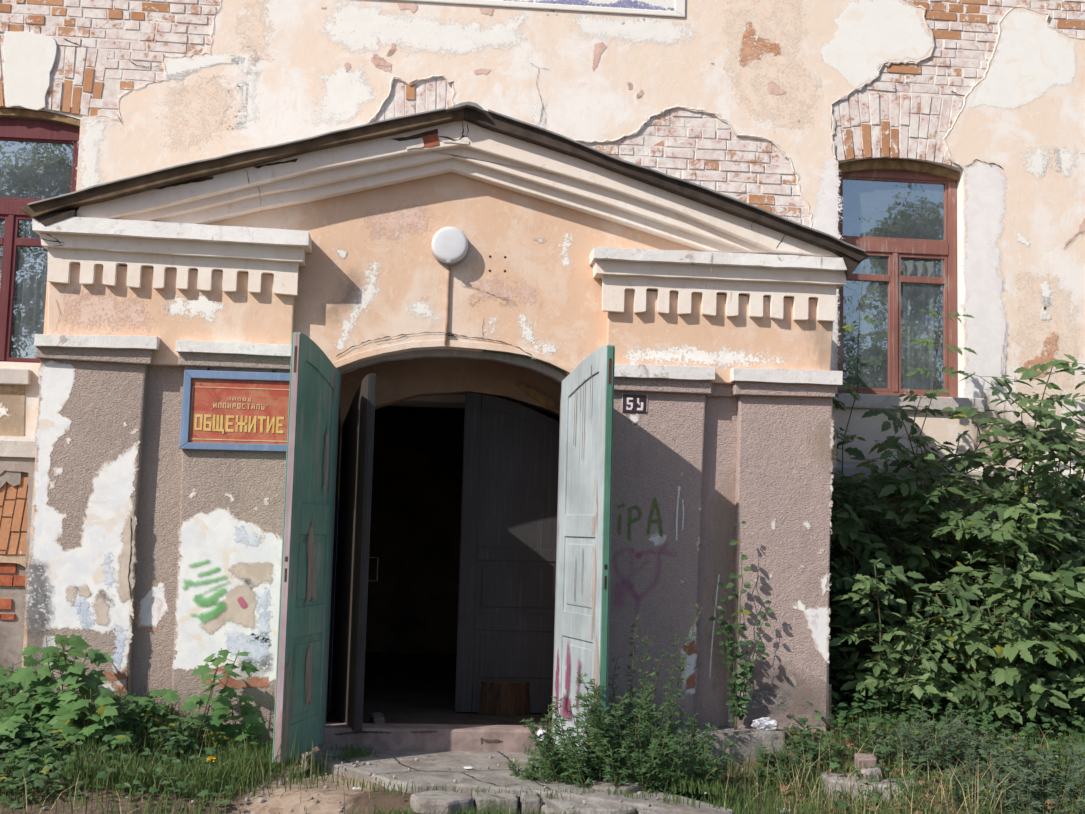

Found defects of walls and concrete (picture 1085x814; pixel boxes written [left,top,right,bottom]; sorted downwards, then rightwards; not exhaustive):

spalling [0,0,280,190]
peeling [311,0,531,128]
spalling [570,0,1085,431]
peeling [55,284,228,335]
peeling [334,260,383,353]
flaking render [0,360,282,702]
spalling [680,615,699,696]
flaking render [792,573,832,664]